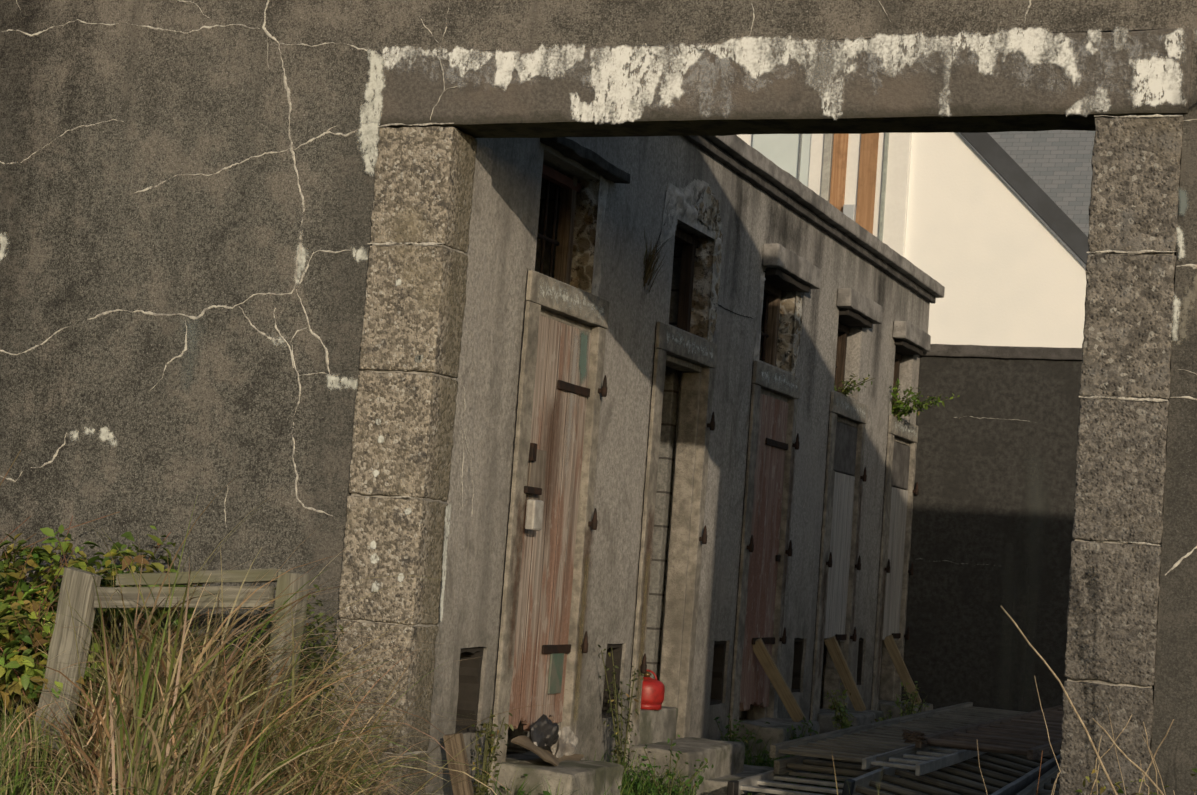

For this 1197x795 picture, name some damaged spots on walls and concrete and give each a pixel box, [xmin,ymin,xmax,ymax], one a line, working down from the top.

peeling [382,28,1197,124]
crack [0,0,371,516]
crack [1170,369,1197,400]
crack [1165,546,1197,575]